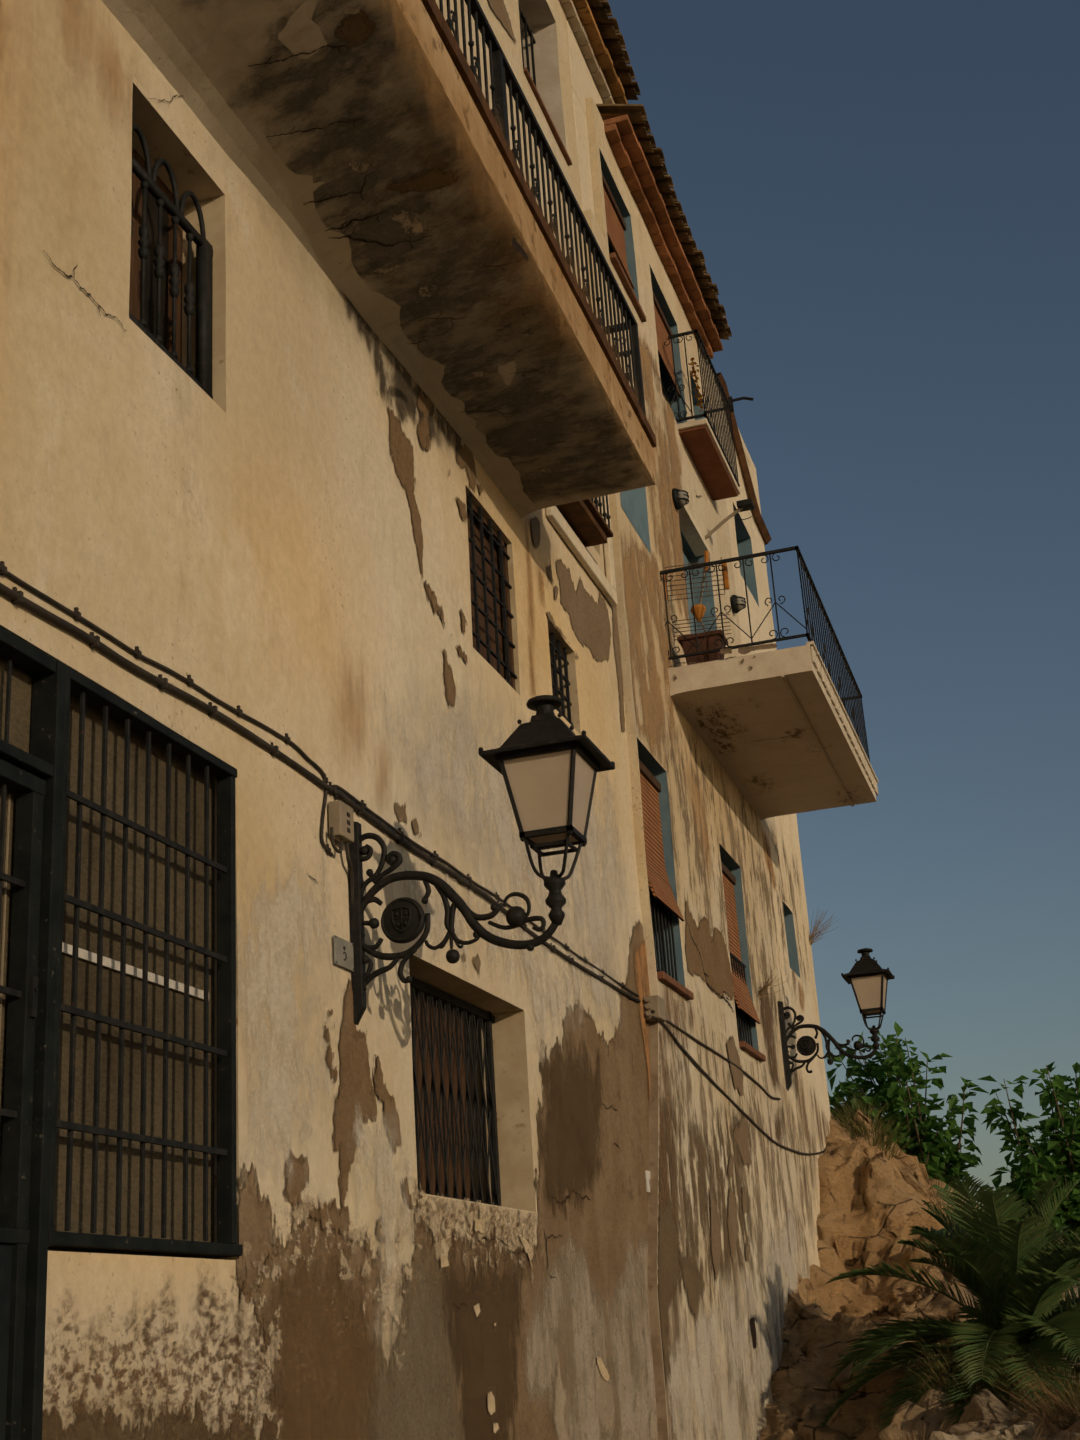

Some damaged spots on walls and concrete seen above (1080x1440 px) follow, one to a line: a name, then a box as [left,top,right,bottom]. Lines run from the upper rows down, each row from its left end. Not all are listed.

crack [43,250,126,331]
damp [249,0,639,500]
peeling [386,392,468,710]
peeling [449,444,486,524]
peeling [531,516,540,548]
peeling [547,338,689,762]
peeling [720,643,777,670]
damp [238,873,332,1168]
peeling [43,919,755,1440]
damp [268,703,815,1440]
peeling [685,898,734,1001]